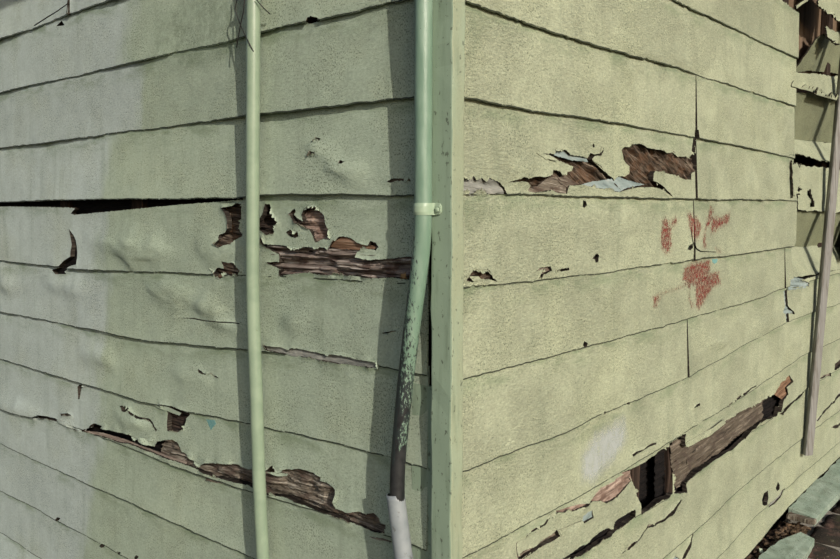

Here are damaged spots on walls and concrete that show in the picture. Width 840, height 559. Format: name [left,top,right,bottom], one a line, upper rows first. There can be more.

peeling [511,144,695,195]
spalling [213,198,243,248]
peeling [259,204,412,279]
spalling [209,262,240,279]
peeling [131,436,158,447]
spalling [155,405,190,433]
peeling [516,419,750,559]